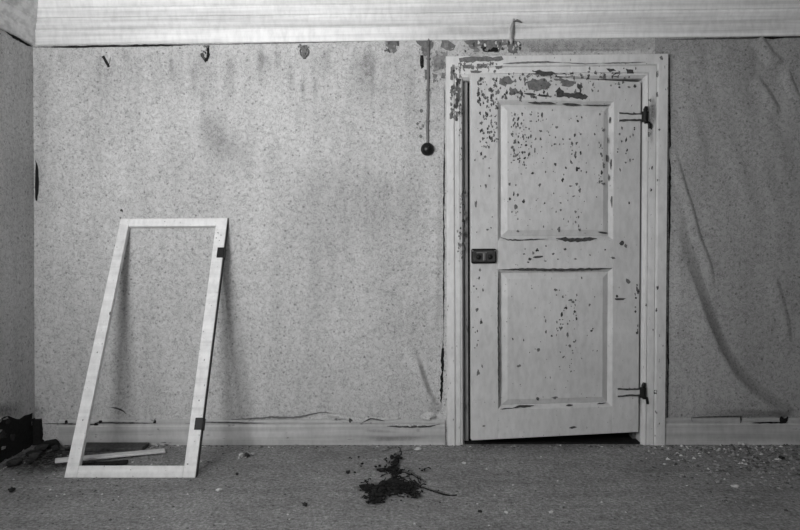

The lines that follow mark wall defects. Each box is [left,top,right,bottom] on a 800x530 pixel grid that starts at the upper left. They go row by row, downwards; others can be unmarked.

peeling [384,41,399,53]
peeling [416,18,636,202]
peeling [457,190,466,259]
peeling [529,288,582,372]